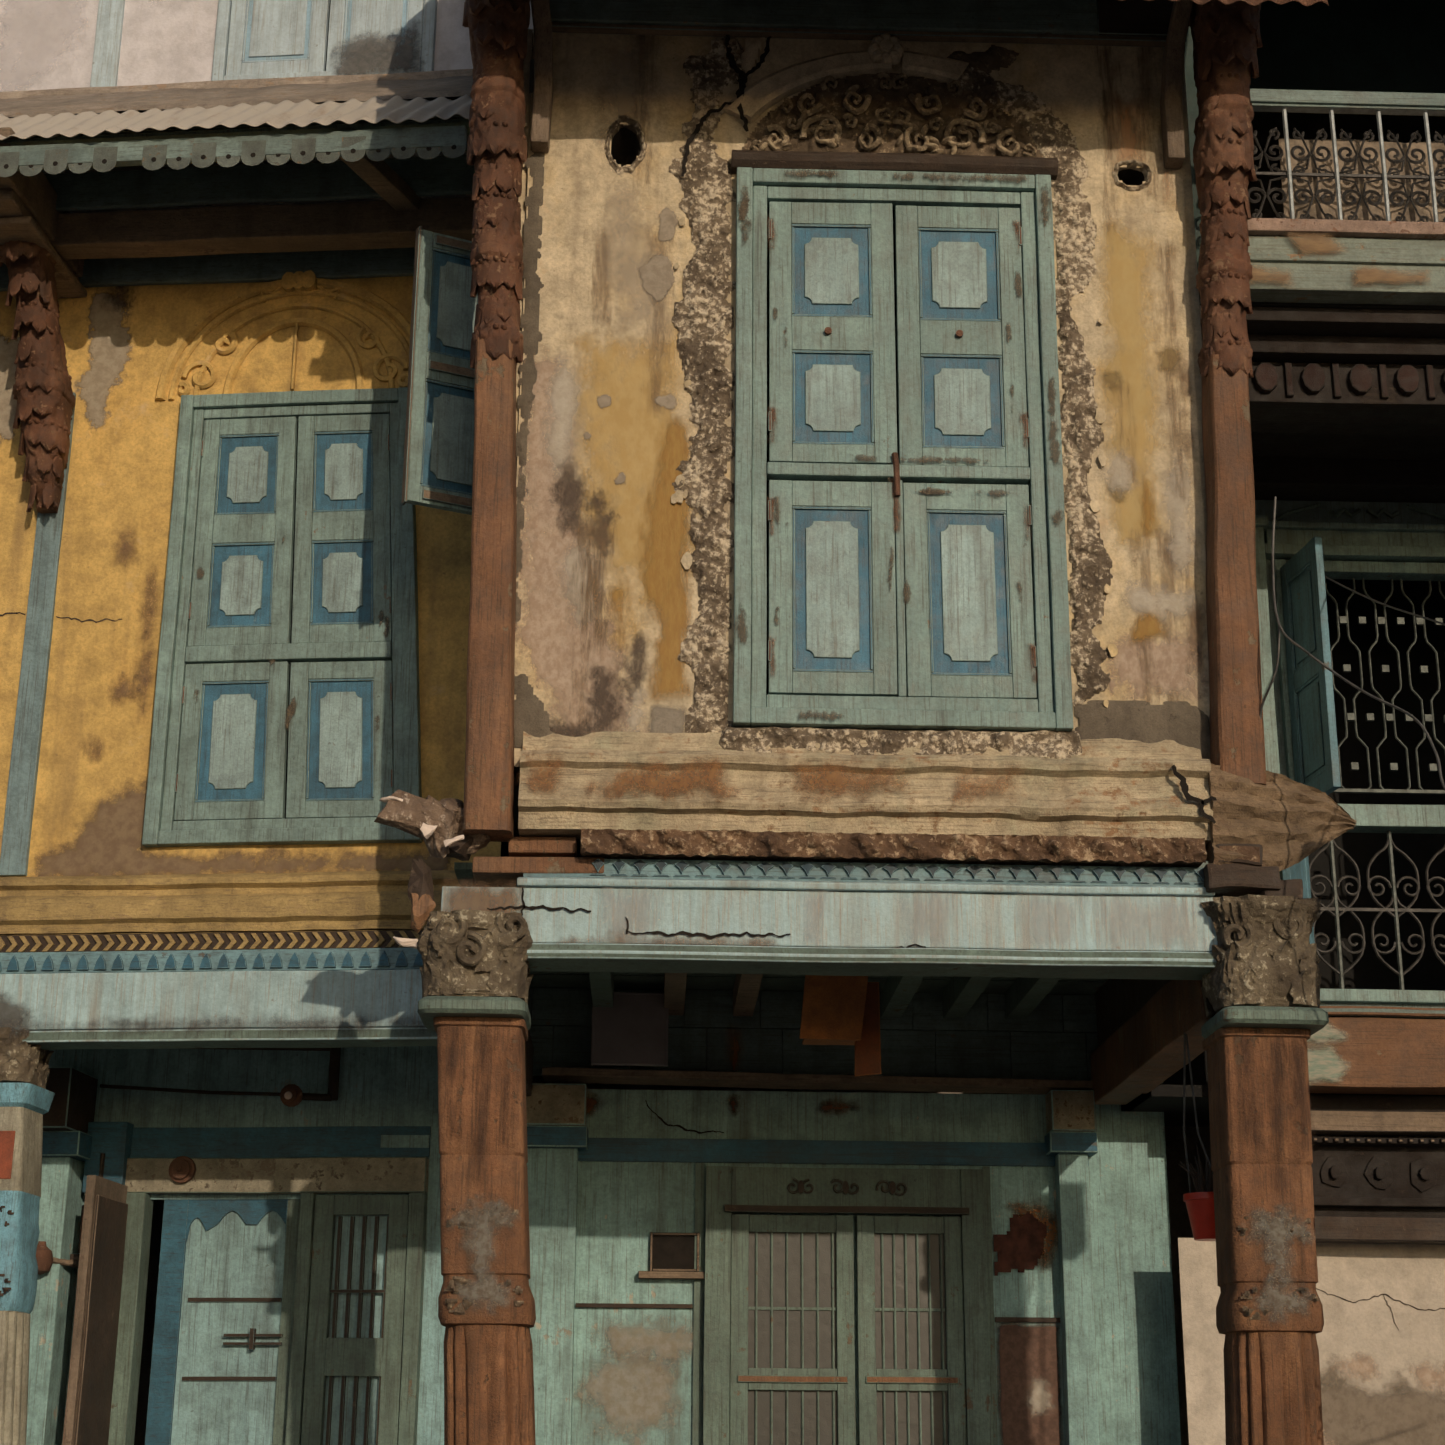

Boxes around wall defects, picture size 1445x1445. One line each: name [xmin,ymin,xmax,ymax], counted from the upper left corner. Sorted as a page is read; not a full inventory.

mould [335,25,420,75]
crack [681,35,771,177]
peeling [0,336,21,442]
peeling [75,293,132,428]
spalling [638,37,765,733]
spalling [947,45,1126,708]
leakage [516,305,690,737]
crack [1171,765,1217,824]
crack [487,888,591,915]
crack [625,917,790,939]
peeling [1307,1024,1348,1082]
crack [1316,1288,1445,1330]